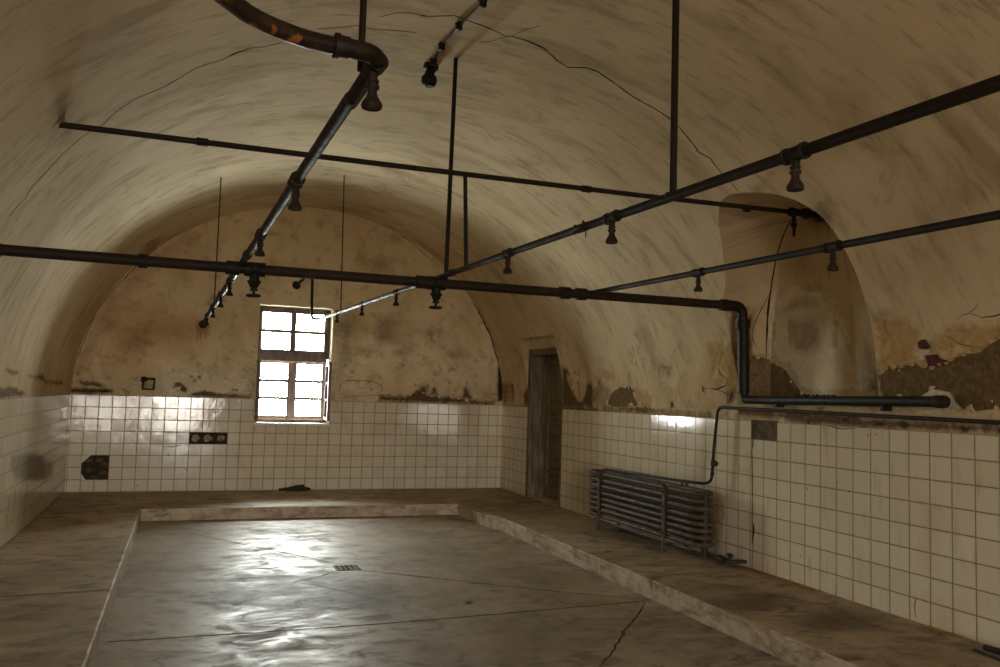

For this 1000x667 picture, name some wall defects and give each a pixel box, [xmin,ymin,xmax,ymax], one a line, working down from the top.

crack [11,42,283,214]
crack [318,13,732,184]
peeling [163,367,252,394]
flaking render [606,385,638,407]
peeling [749,283,862,396]
flaking render [879,335,1000,412]
crack [108,422,755,667]